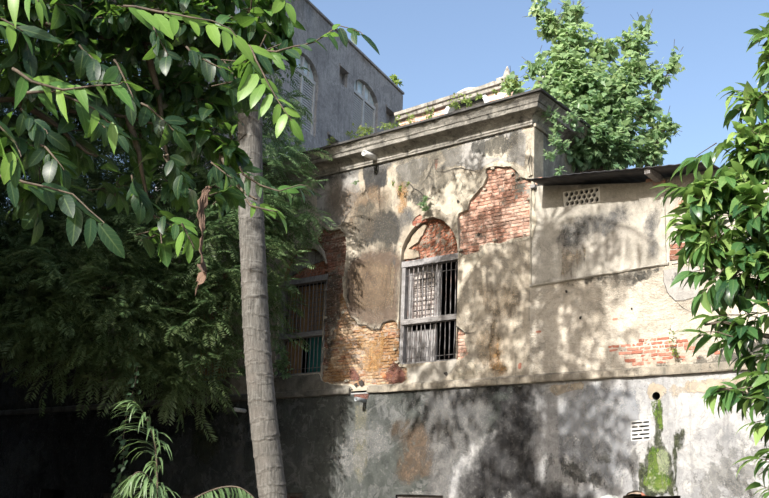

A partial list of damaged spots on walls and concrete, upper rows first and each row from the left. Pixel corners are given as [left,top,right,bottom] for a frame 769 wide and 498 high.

leakage [318,159,402,232]
flaking render [316,169,407,386]
flaking render [429,136,542,274]
leakage [558,208,626,274]
flaking render [608,337,698,366]
leakage [276,362,589,498]